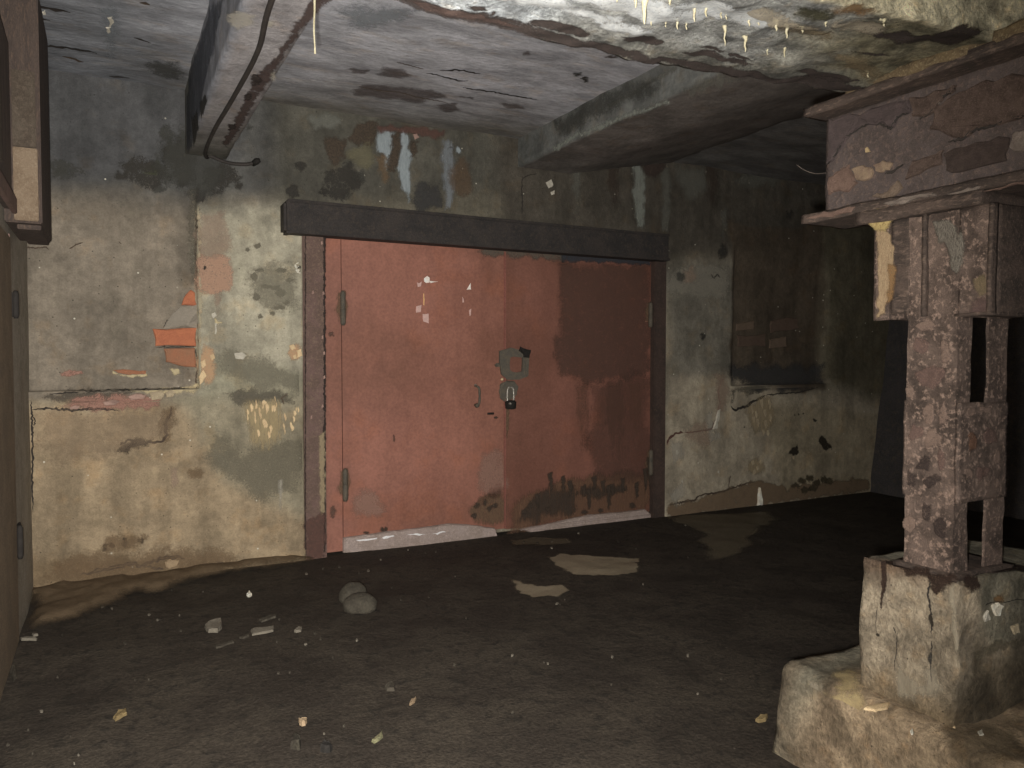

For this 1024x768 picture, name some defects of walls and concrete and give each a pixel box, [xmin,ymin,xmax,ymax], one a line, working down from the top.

water stain [500,0,887,58]
water stain [116,0,253,203]
water stain [309,113,473,211]
flaking render [153,189,216,388]
crack [117,406,174,453]
crack [667,379,724,444]
corrosion [470,457,650,533]
crack [875,561,897,667]
crack [926,579,934,682]